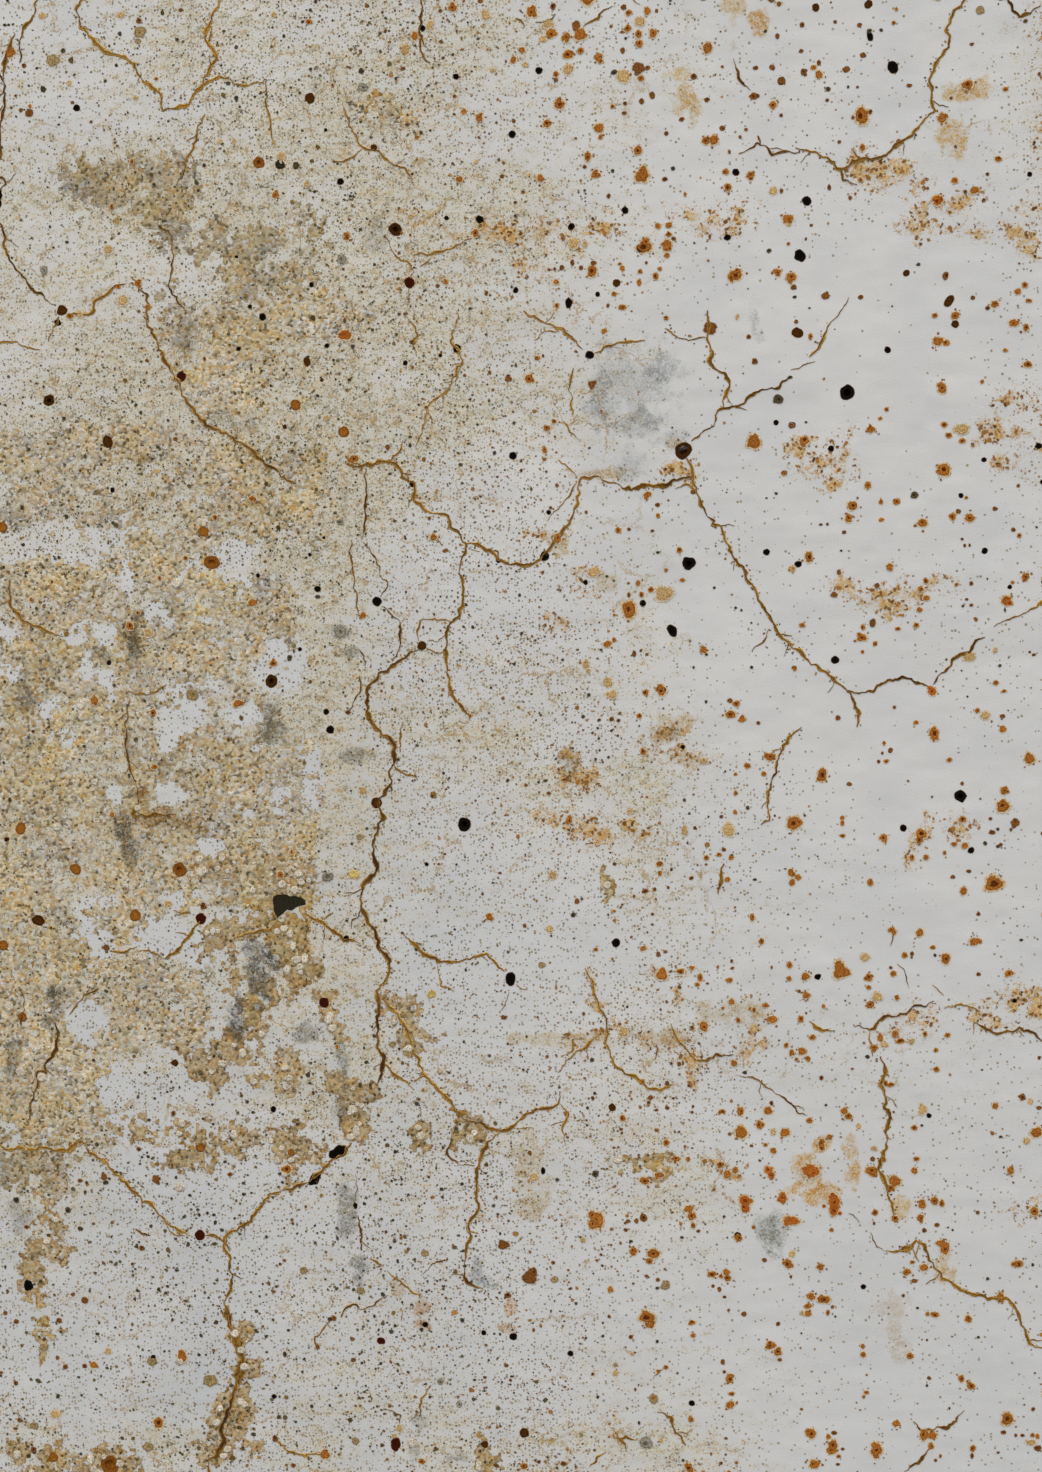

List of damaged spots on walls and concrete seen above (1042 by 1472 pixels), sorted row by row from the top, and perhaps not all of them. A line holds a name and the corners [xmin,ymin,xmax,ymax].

crack [514,0,638,27]
crack [739,0,1041,185]
crack [334,104,413,183]
crack [0,0,296,489]
crack [385,236,472,356]
crack [0,297,1042,1472]
rust [784,867,802,887]
rust [679,1200,700,1233]
rust [706,1268,747,1317]
rust [799,1262,837,1318]
rust [871,1194,952,1318]
rust [956,1374,978,1391]